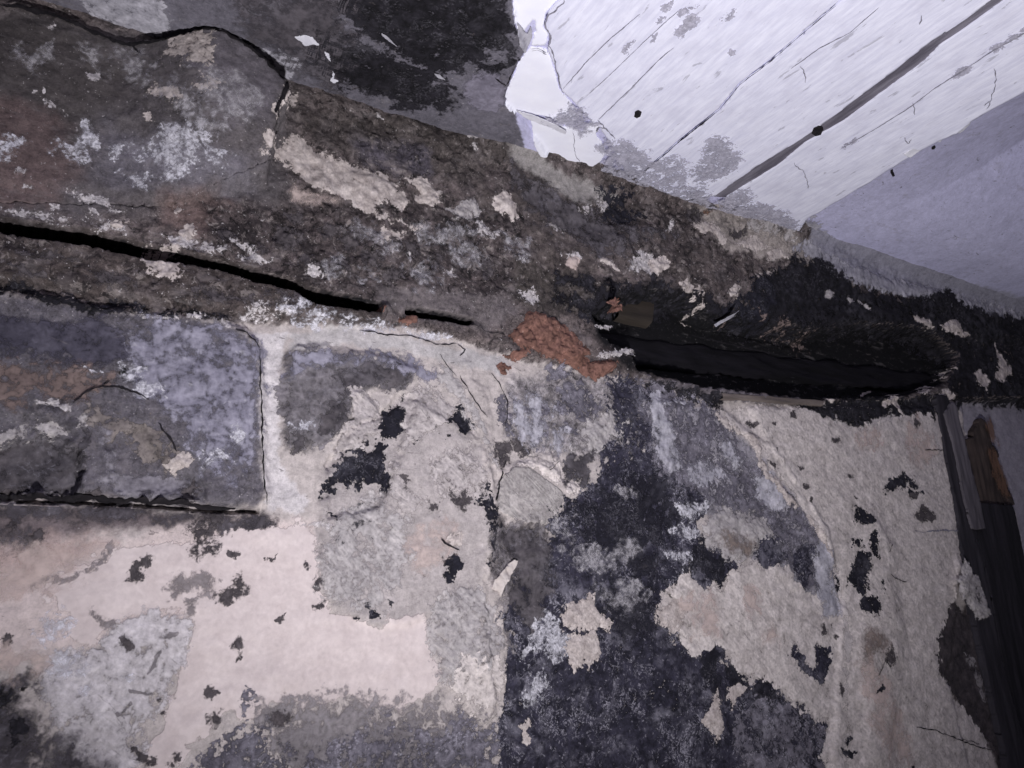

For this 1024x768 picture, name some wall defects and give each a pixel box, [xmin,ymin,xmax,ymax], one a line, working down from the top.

crack [0,4,289,116]
damp [705,271,778,338]
crack [236,329,268,497]
flaking render [332,385,383,461]
crack [0,492,235,511]
damp [251,348,828,768]